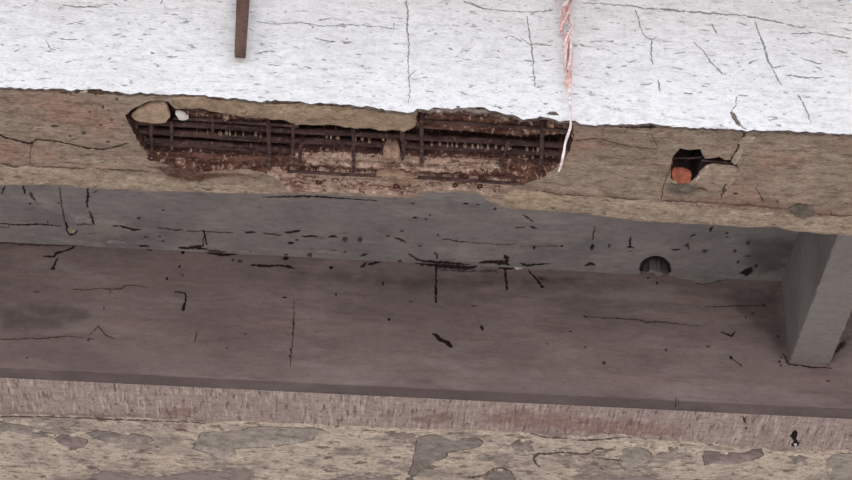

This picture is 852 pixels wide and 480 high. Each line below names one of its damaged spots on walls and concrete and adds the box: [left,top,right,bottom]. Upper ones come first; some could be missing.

crack [464,1,552,86]
crack [585,3,852,120]
crack [0,134,338,238]
corrosion [158,167,233,191]
spalling [0,85,852,210]
crack [0,188,93,270]
crack [442,214,563,250]
crack [0,325,113,341]
crack [288,306,296,366]